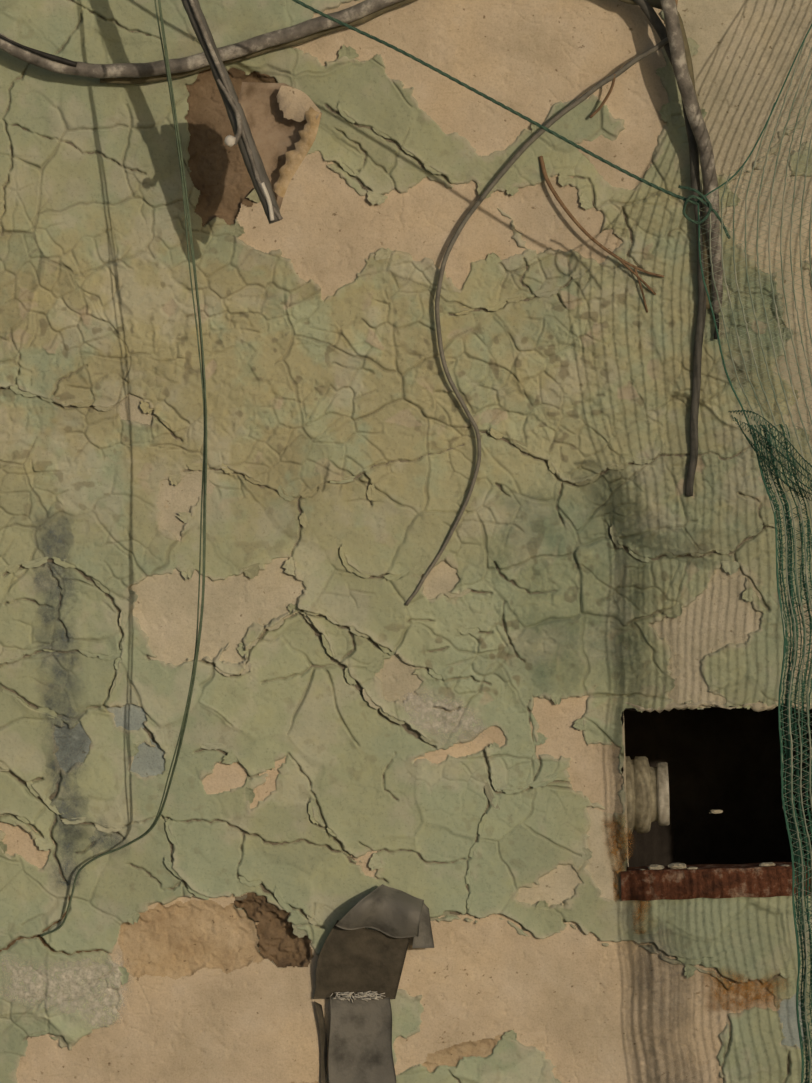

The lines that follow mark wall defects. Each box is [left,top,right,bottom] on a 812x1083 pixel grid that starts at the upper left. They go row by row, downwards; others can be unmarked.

crack [325,102,448,191]
peeling [185,68,622,301]
peeling [291,0,672,190]
peeling [677,0,812,446]
crack [159,418,741,547]
crack [0,557,150,738]
crack [206,610,438,747]
spalling [516,561,812,910]
crack [0,752,560,955]
rust [606,821,632,899]
peeling [16,892,331,1083]
rust [714,976,775,1010]